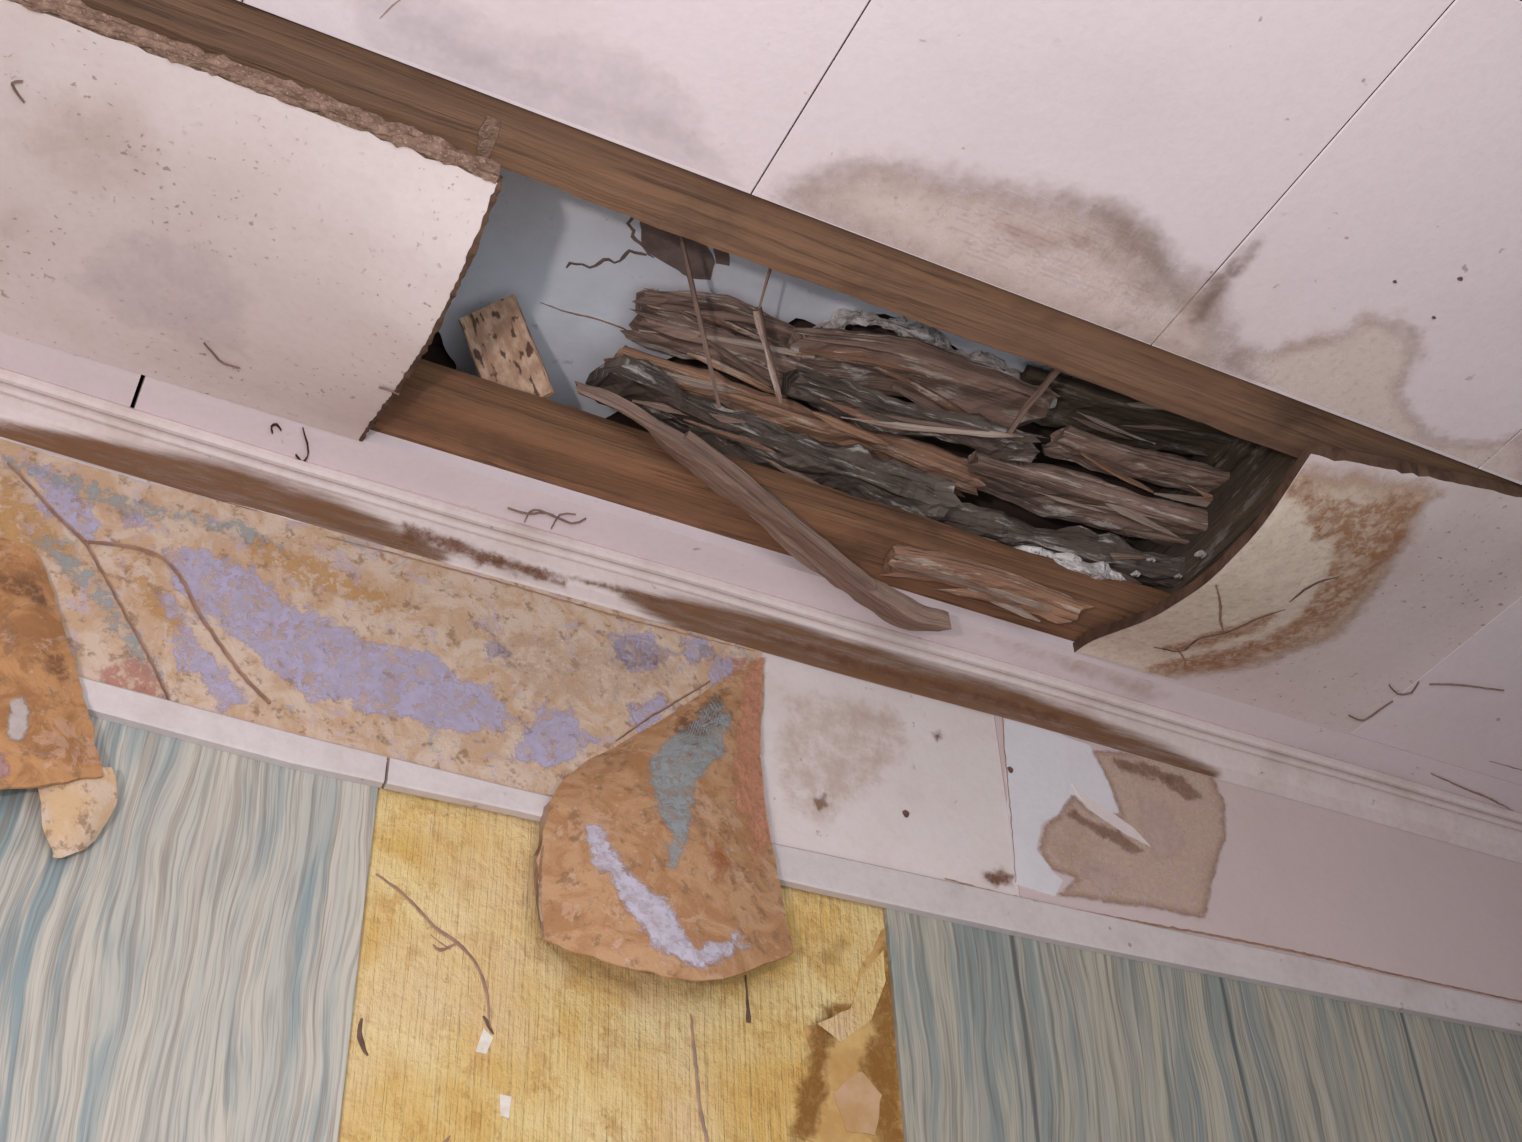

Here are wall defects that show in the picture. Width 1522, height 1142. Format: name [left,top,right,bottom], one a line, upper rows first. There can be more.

peeling [566,217,730,280]
leakage [1079,472,1427,676]
peeling [1004,719,1151,896]